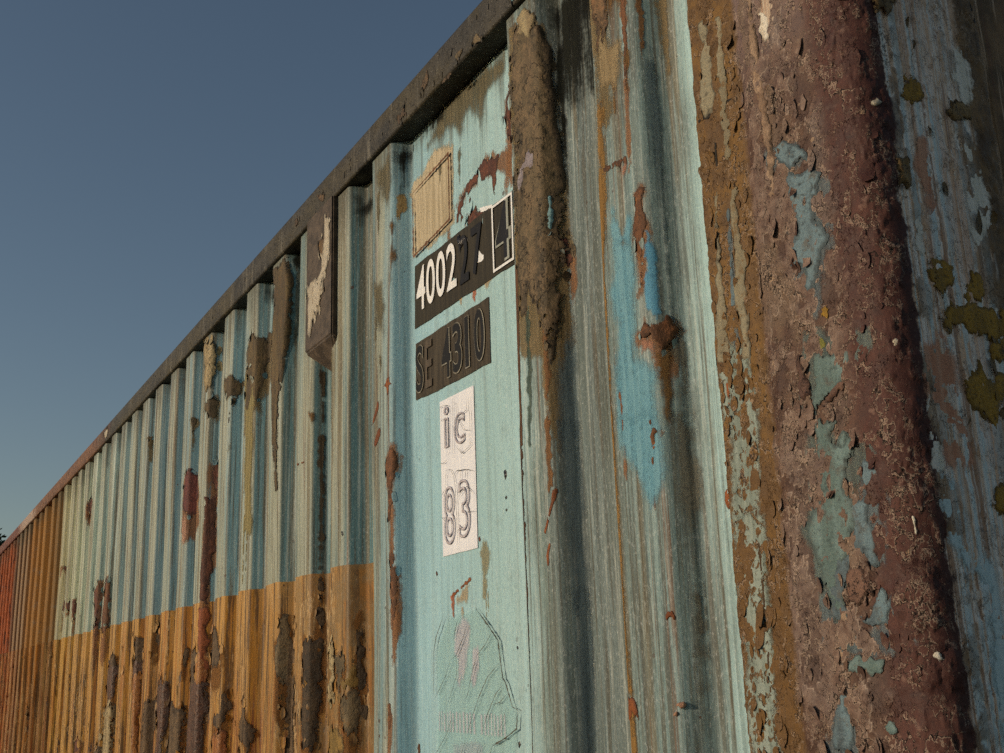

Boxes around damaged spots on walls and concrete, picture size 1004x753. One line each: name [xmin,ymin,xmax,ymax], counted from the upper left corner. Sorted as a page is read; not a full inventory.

rust [447,86,513,239]
peeling [698,0,834,437]
peeling [951,47,973,105]
peeling [962,143,998,259]
rust [182,456,218,683]
rust [189,330,272,580]
rust [384,443,403,662]
rust [649,419,663,465]
rust [634,315,683,419]
peeling [765,312,911,680]
peeling [923,333,974,518]
peeling [740,593,791,753]